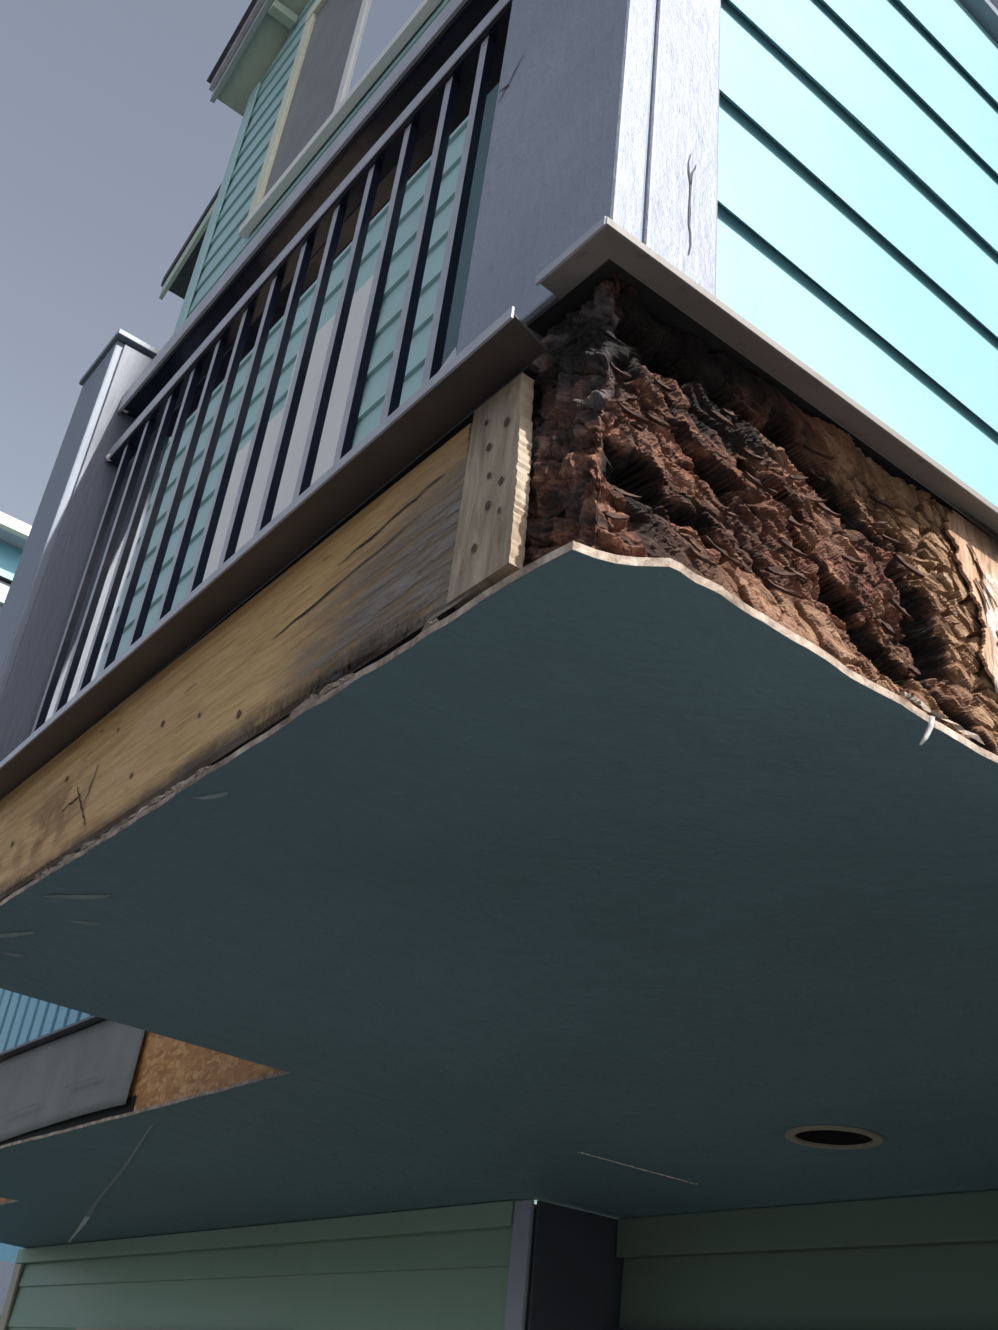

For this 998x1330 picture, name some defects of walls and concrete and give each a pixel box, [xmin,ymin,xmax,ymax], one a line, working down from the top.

crack [688,154,696,255]
damp [984,575,998,651]